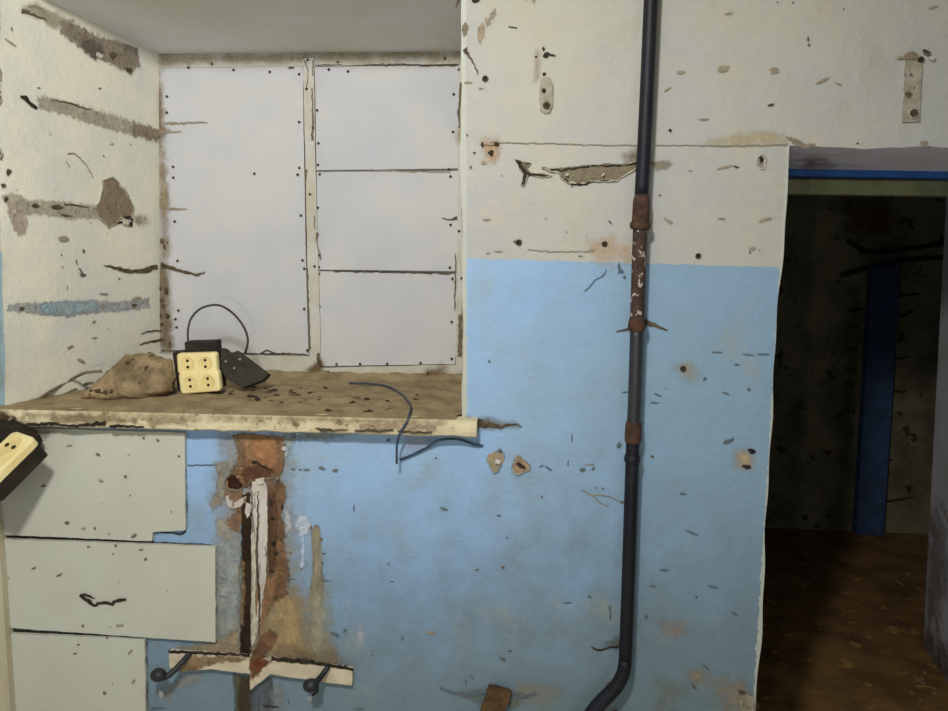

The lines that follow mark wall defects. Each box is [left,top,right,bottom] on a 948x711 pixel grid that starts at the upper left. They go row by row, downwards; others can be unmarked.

peeling [21,5,140,75]
peeling [20,87,160,145]
flaking render [515,159,636,187]
peeling [1,169,146,236]
peeling [486,449,552,476]